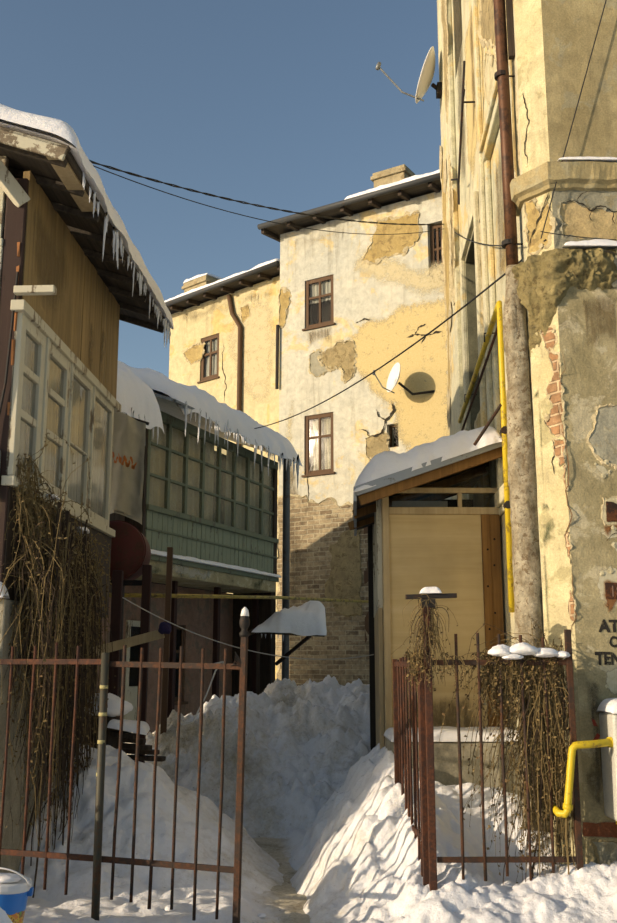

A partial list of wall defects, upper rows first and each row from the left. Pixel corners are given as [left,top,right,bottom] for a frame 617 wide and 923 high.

peeling [508,59,520,178]
crack [522,95,530,167]
peeling [523,198,617,256]
peeling [308,146,455,461]
flaking render [540,325,569,492]
spalling [586,403,617,479]
peeling [601,496,617,551]
flaking render [275,494,369,686]
peeling [598,566,617,607]